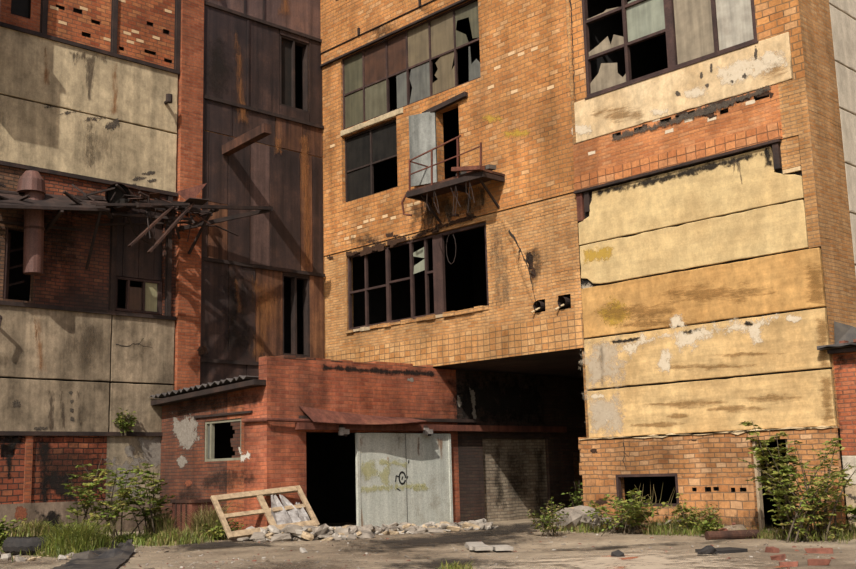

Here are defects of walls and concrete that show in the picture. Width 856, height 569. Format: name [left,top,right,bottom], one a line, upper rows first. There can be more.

water stain [73,52,104,98]
peeling [612,46,788,141]
crack [508,230,537,304]
peeling [578,314,802,475]
peeling [172,411,200,468]
water stain [46,469,76,501]